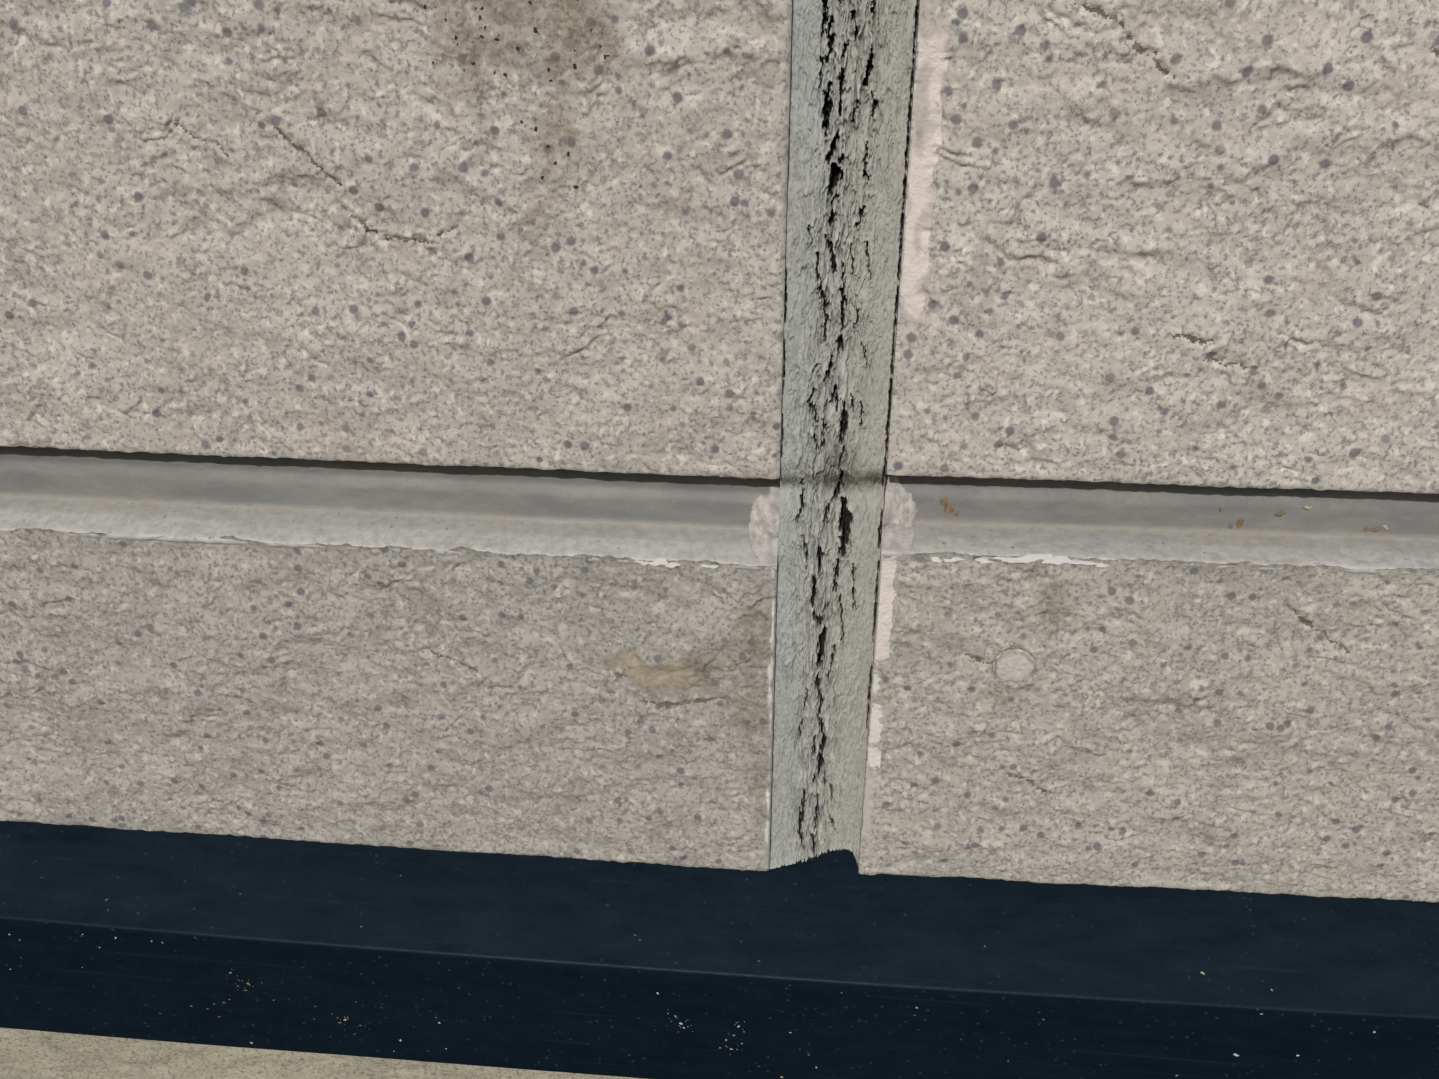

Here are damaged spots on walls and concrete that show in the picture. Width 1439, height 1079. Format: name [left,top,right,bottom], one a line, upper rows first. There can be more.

crack [781,0,919,855]